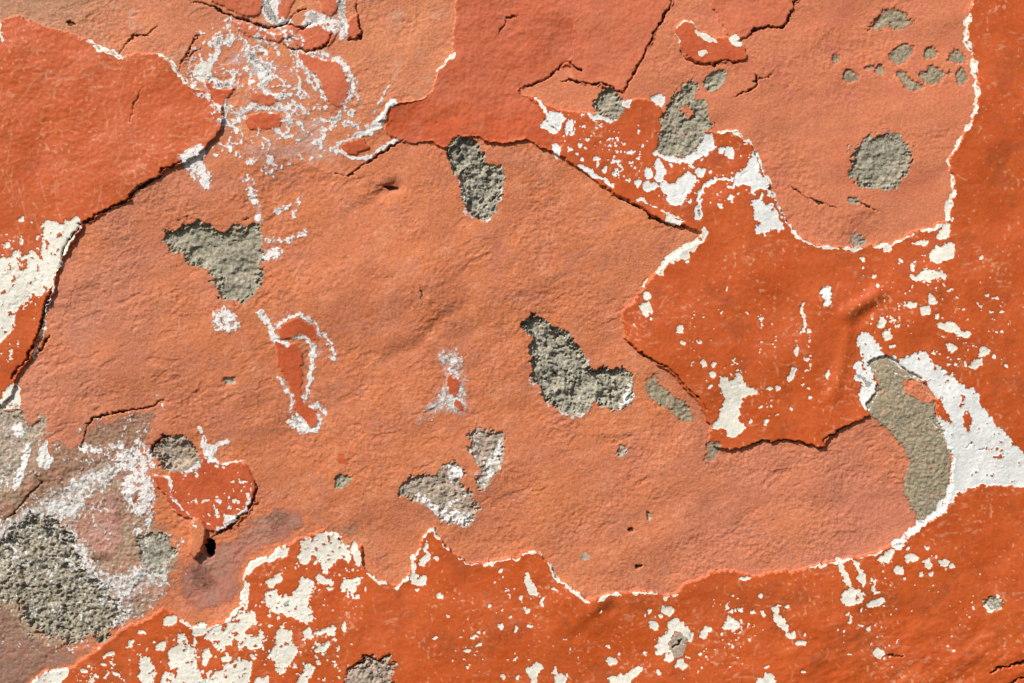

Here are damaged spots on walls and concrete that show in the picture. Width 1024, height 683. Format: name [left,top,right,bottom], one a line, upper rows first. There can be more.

crack [524,0,672,94]
crack [336,141,402,177]
crack [62,161,182,256]
crack [619,198,685,228]
peeling [904,261,953,294]
crack [11,291,52,379]
peeling [935,313,996,369]
crack [83,401,159,443]
peeling [262,622,302,677]
peeling [605,644,643,683]
peeling [649,605,694,670]
peeling [712,595,807,648]